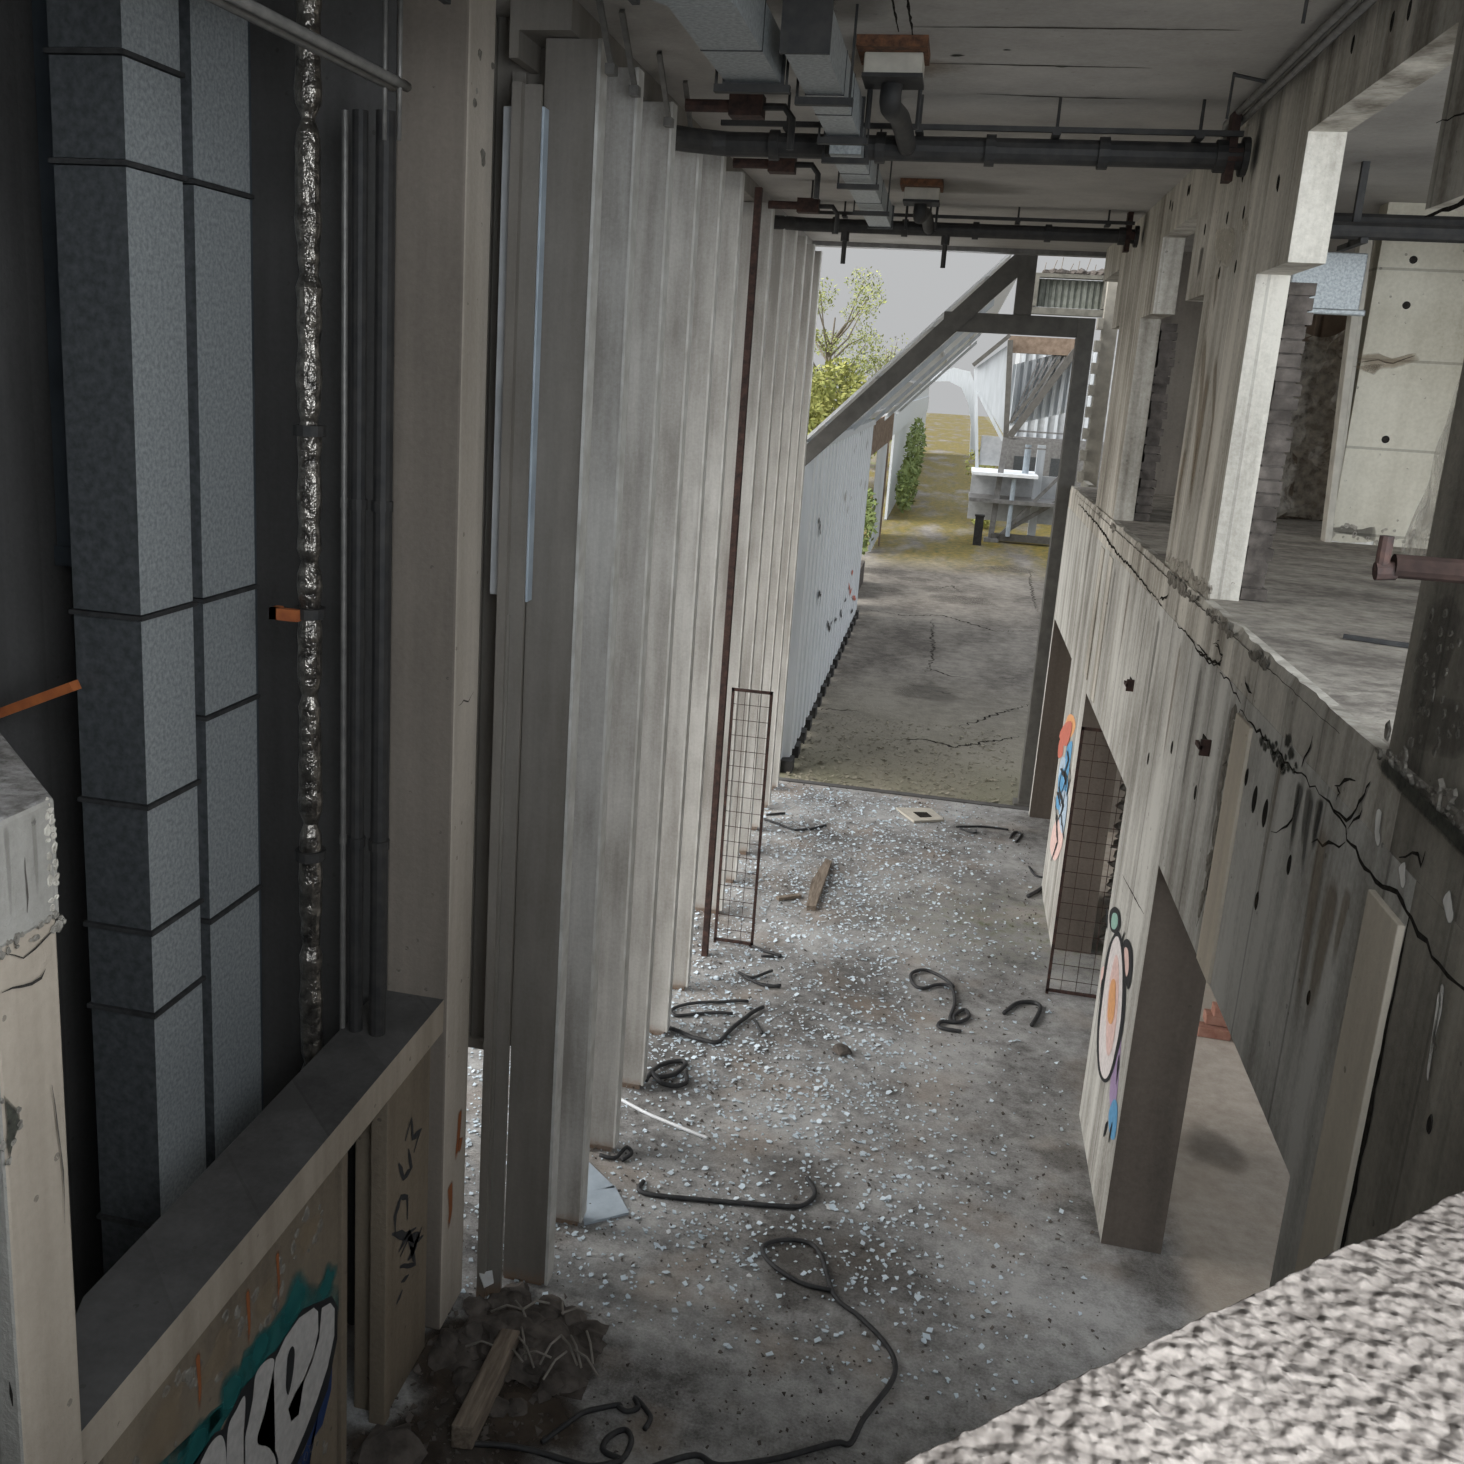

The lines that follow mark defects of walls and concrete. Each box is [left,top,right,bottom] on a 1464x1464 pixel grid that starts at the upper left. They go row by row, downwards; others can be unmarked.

crack [1425,198,1464,217]
spalling [1375,720,1464,858]
crack [1078,498,1464,1249]